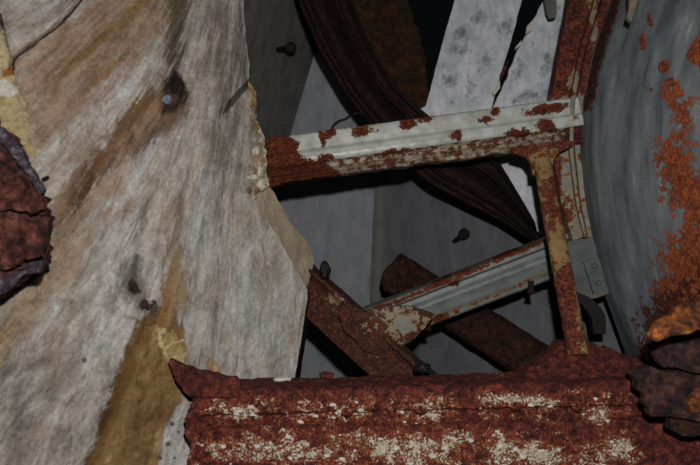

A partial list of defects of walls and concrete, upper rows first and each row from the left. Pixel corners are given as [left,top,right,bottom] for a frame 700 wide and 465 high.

rust [637,12,655,51]
rust [583,0,620,112]
rust [686,35,700,72]
rust [351,125,379,139]
rust [397,116,435,131]
rust [478,107,501,125]
rust [503,101,570,139]
rust [264,129,342,189]
rust [368,147,419,161]
rust [627,59,700,360]
rust [490,245,523,261]
rust [426,271,461,289]